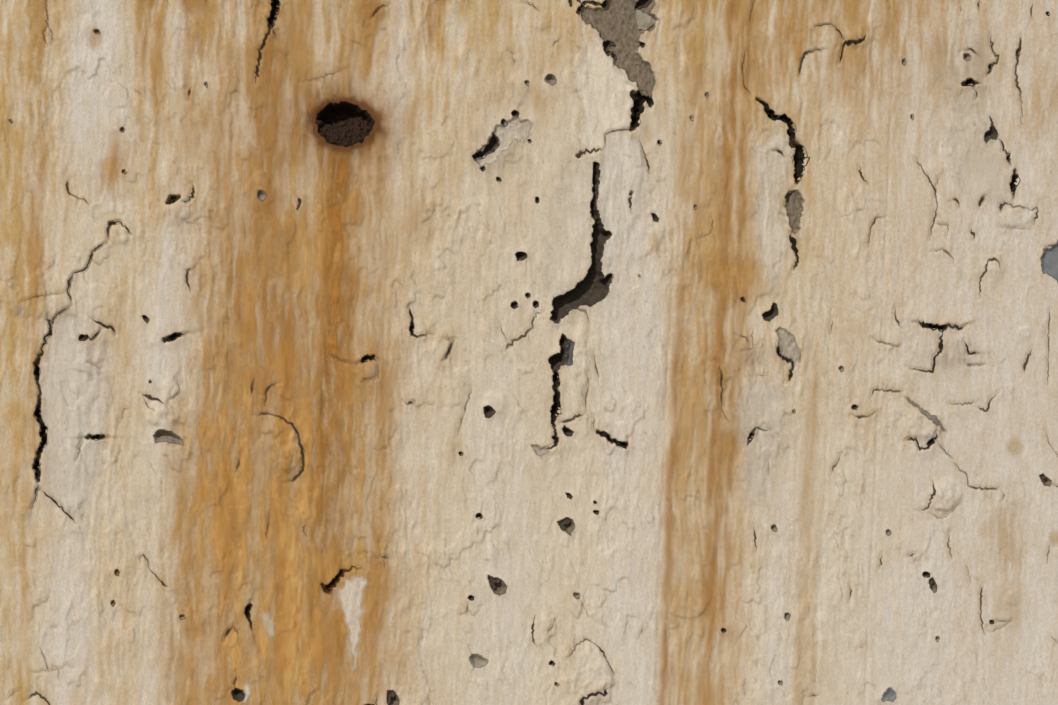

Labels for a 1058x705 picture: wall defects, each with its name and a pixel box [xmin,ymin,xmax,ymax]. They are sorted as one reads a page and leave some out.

crack [30,221,129,520]
crack [255,0,280,82]
corrosion [179,39,385,705]
spalling [472,117,533,166]
crack [501,90,654,450]
peeling [544,0,656,295]
corrosion [674,112,735,482]
crack [741,53,810,270]
peeling [755,138,805,287]
spalling [776,327,800,365]
crack [856,310,1005,497]
peeling [1041,240,1058,282]